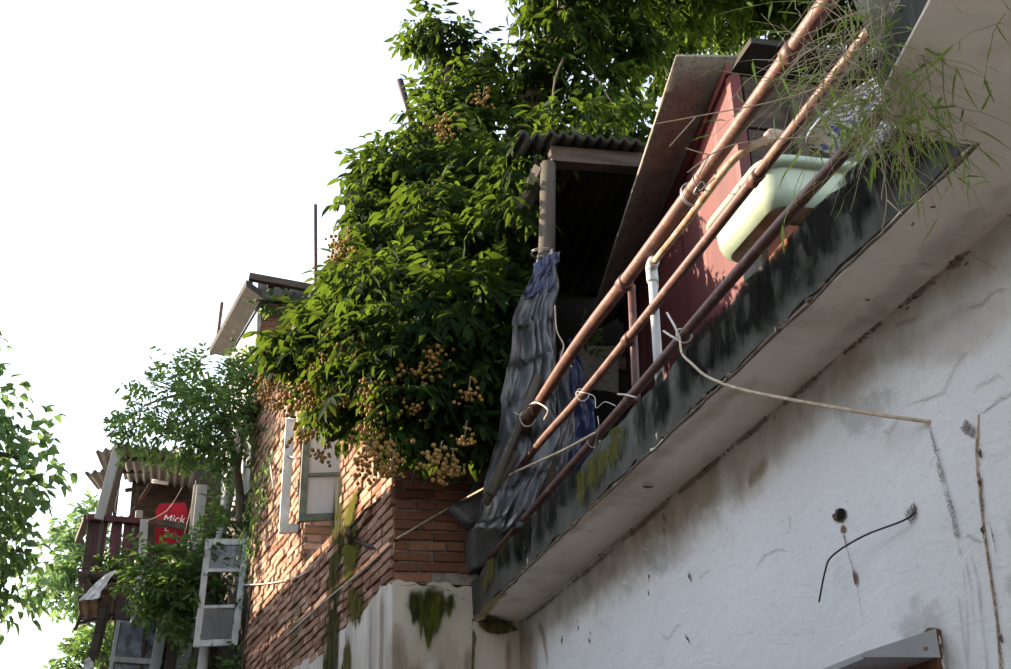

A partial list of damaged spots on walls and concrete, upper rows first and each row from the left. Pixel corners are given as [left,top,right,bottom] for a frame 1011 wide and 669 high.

damp [676,128,938,395]
damp [634,368,668,443]
damp [323,471,382,669]
damp [393,641,403,669]
damp [410,592,453,649]
damp [465,432,620,669]